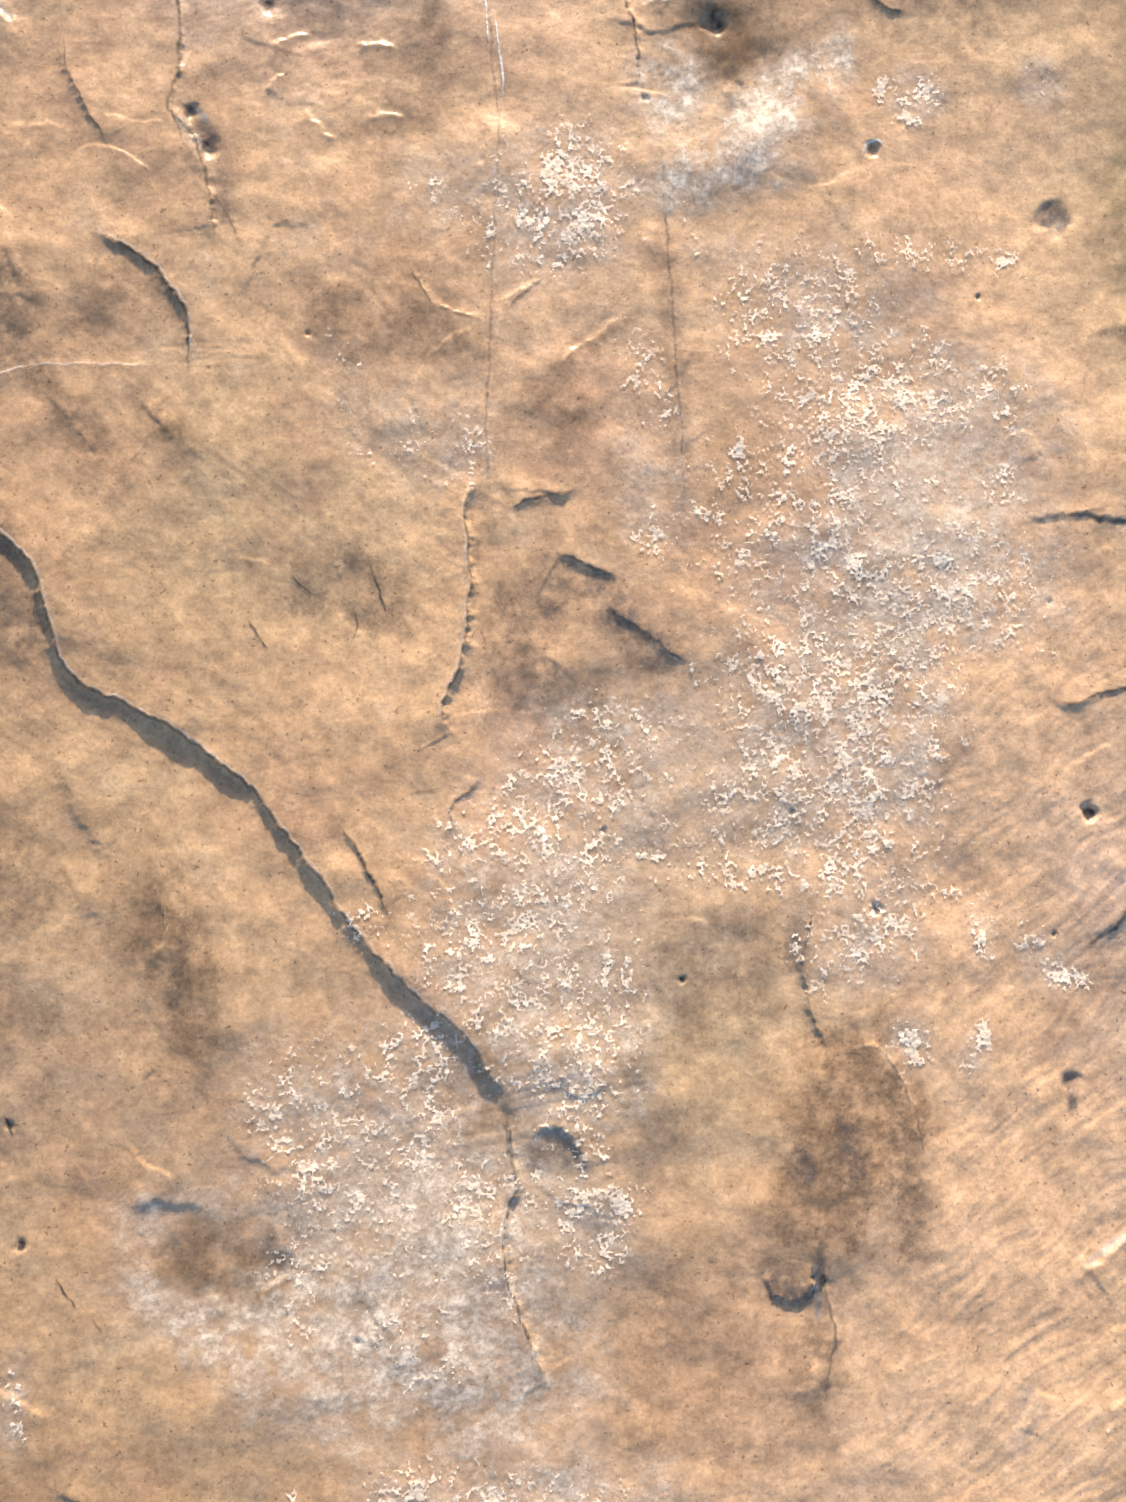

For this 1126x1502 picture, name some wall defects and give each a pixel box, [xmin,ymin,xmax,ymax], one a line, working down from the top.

damp [495,18,504,93]
crack [626,4,639,68]
damp [872,72,947,129]
damp [428,35,853,277]
crack [1031,509,1126,523]
crack [345,834,382,899]
damp [131,235,1065,1502]
damp [1010,919,1093,991]
crack [1090,914,1126,944]
crack [503,1159,529,1340]